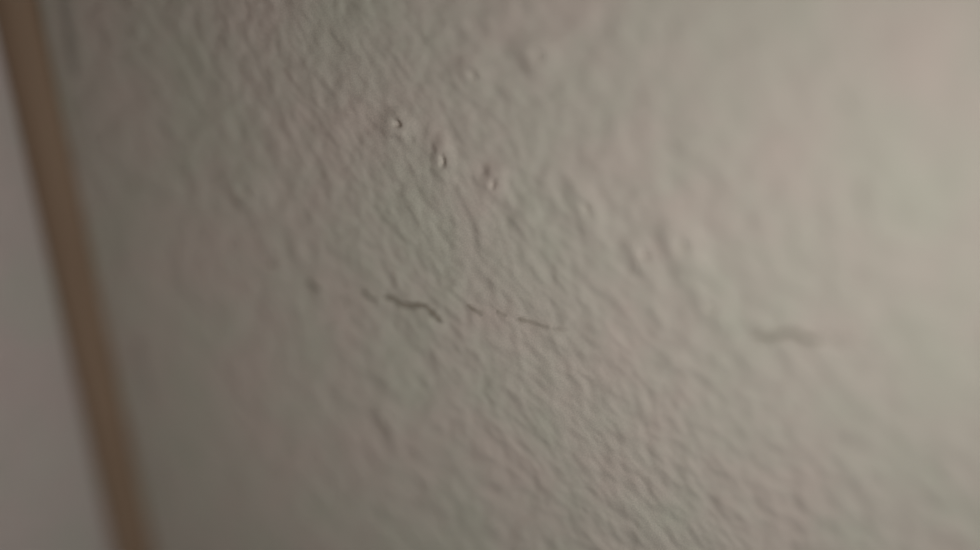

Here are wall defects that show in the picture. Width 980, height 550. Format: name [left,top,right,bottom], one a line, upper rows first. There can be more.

crack [363,290,441,322]